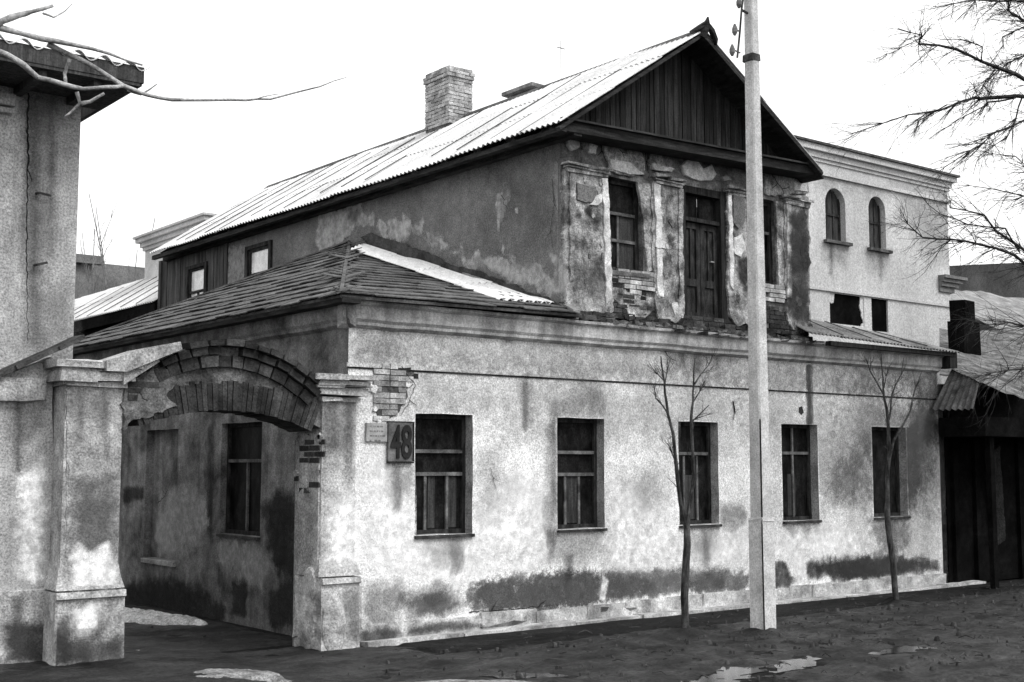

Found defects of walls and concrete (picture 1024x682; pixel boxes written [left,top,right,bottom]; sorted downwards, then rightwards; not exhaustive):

crack [24,93,32,340]
flaking render [566,140,731,222]
flaking render [762,173,809,197]
flaking render [315,190,748,339]
water stain [787,209,811,324]
flaking render [765,283,824,345]
flaking render [127,381,159,401]
flaking render [365,363,419,423]
flaking render [293,432,325,493]
water stain [260,492,295,629]
water stain [324,454,750,641]
water stain [775,525,939,589]